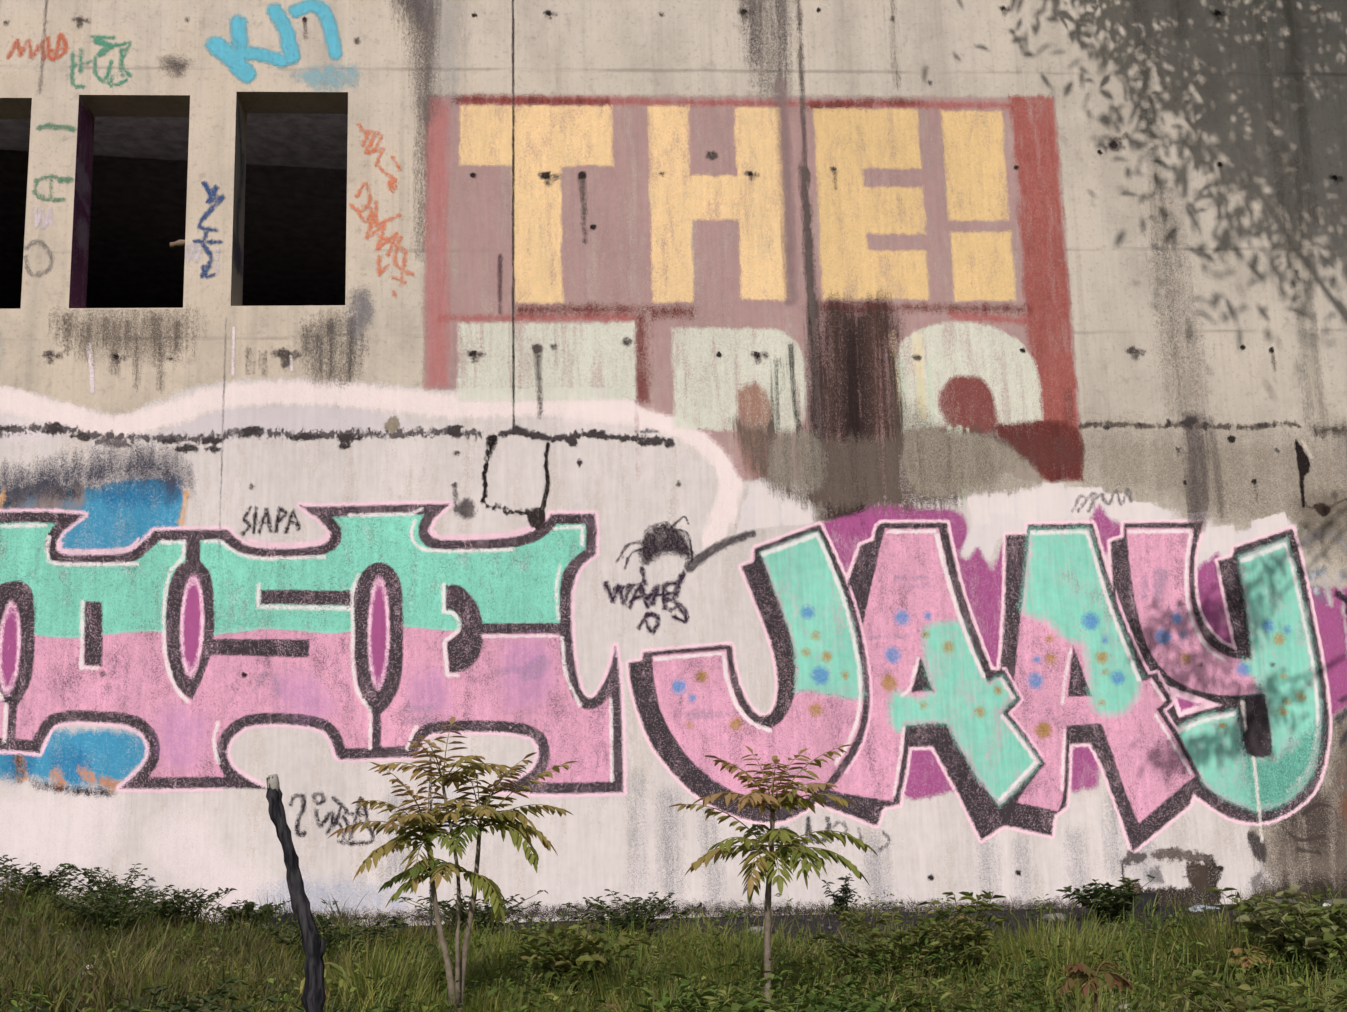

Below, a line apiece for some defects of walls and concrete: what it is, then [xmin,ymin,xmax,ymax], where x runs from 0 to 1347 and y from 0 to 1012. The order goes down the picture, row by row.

damp [733,0,802,110]
damp [47,300,209,393]
damp [294,286,374,390]
damp [726,286,1084,546]
peeling [1120,846,1223,906]